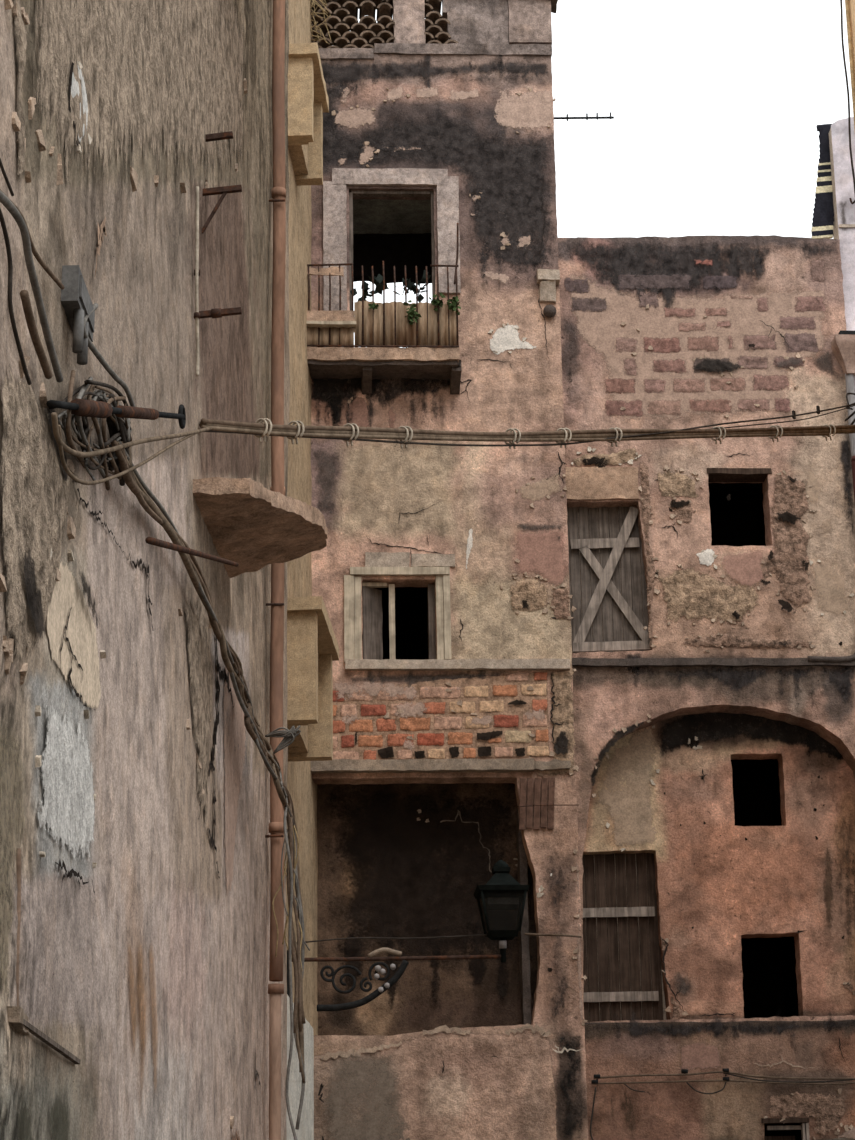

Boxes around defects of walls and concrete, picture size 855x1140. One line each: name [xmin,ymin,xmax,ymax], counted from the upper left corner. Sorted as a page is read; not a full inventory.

water stain [321,55,552,283]
water stain [802,244,834,255]
water stain [567,243,770,309]
peeling [487,322,536,355]
water stain [311,378,450,425]
spalling [515,446,817,653]
water stain [669,668,813,699]
water stain [823,667,854,703]
water stain [659,712,843,759]
water stain [560,1036,582,1138]
flaking render [763,1088,855,1140]